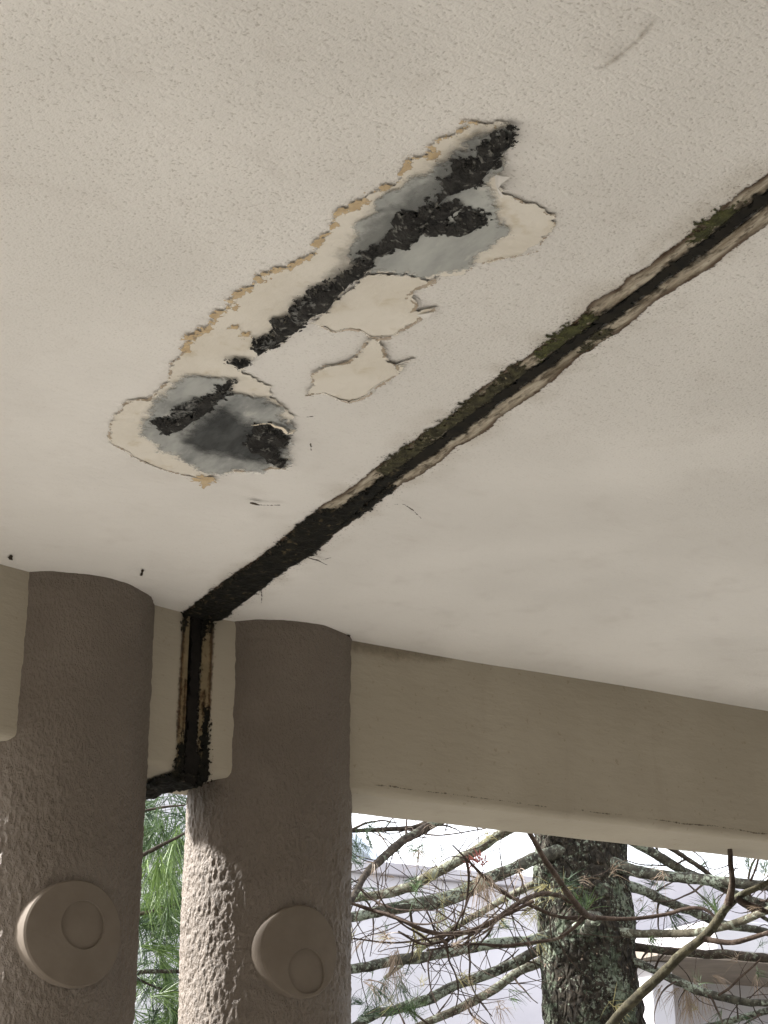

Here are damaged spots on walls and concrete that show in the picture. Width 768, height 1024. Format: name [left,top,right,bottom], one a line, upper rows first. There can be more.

crack [149,379,238,436]
peeling [107,120,556,489]
crack [250,125,520,356]
damp [347,128,515,279]
damp [140,189,768,800]